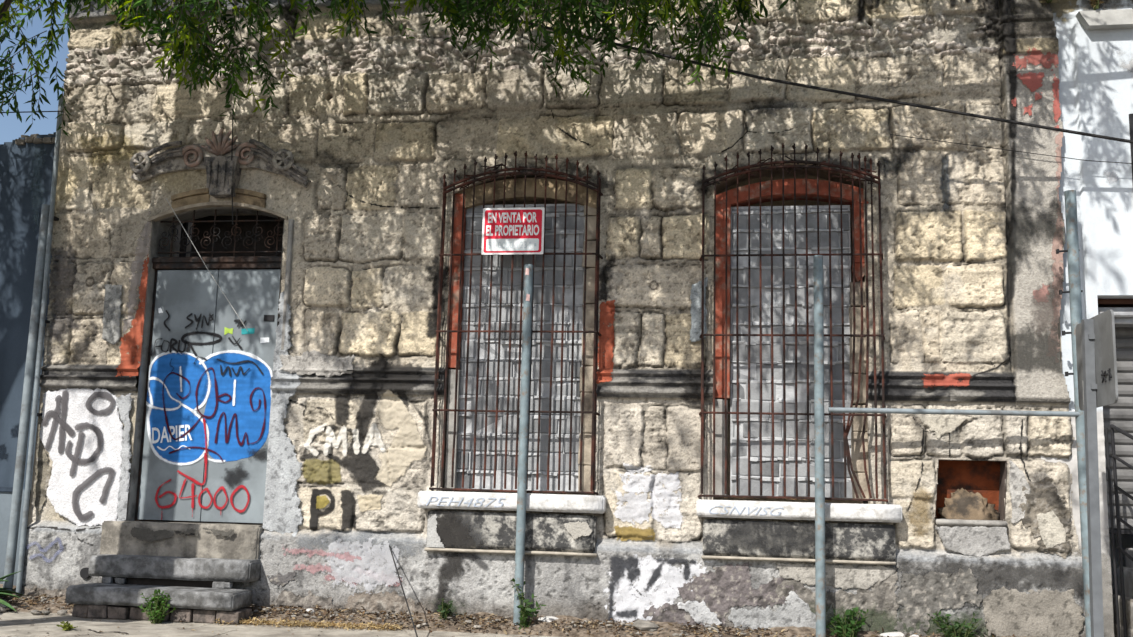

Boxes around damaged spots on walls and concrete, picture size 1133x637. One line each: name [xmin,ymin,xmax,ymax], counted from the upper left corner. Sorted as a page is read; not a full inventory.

water stain [858,0,879,21]
peeling [1011,48,1064,351]
water stain [1001,0,1133,375]
peeling [102,211,152,377]
peeling [31,388,234,542]
water stain [433,510,488,614]
peeling [603,461,1085,637]